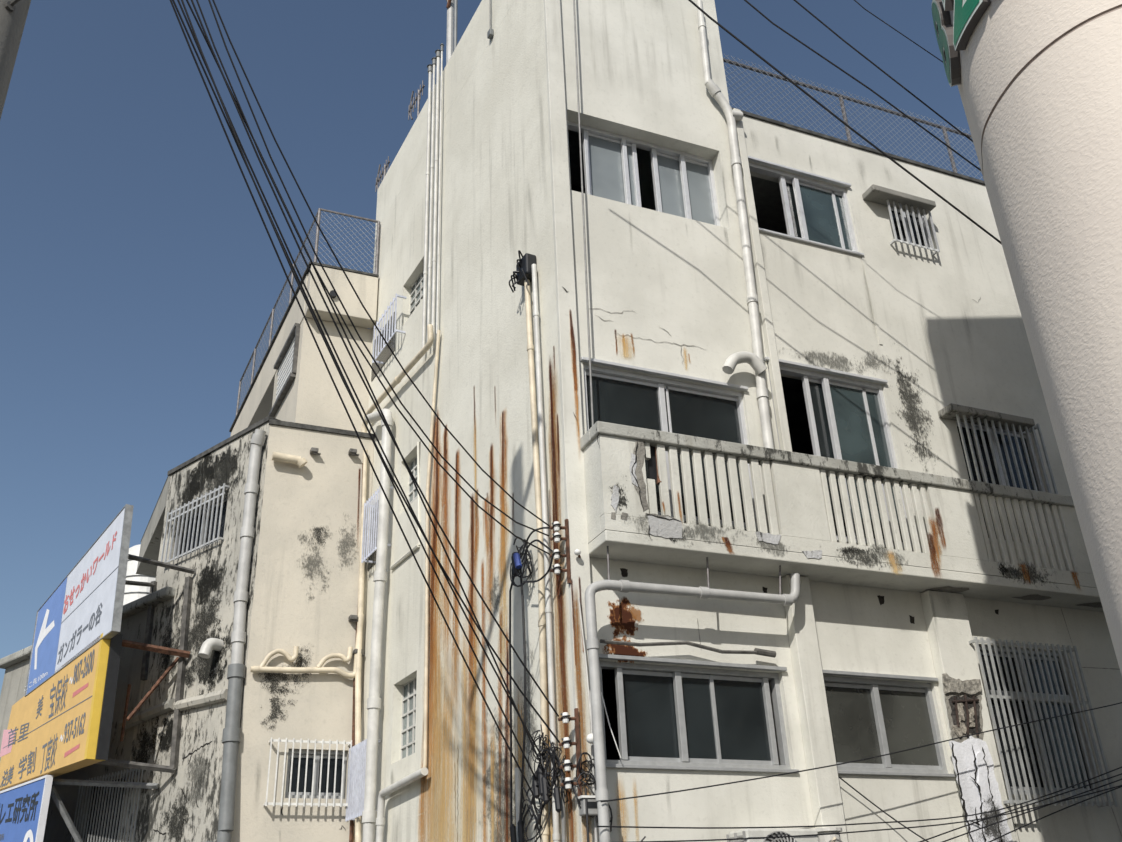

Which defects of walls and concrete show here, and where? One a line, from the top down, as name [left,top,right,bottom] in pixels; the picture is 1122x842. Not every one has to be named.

crack [563,287,706,362]
water stain [174,439,241,537]
peeling [611,485,628,520]
peeling [629,440,683,539]
corrosion [928,509,946,574]
water stain [156,559,231,695]
corrosion [418,387,525,842]
corrosion [547,346,591,842]
corrosion [602,597,647,663]
water stain [258,646,311,733]
spalling [942,673,984,842]
crack [970,746,1003,842]